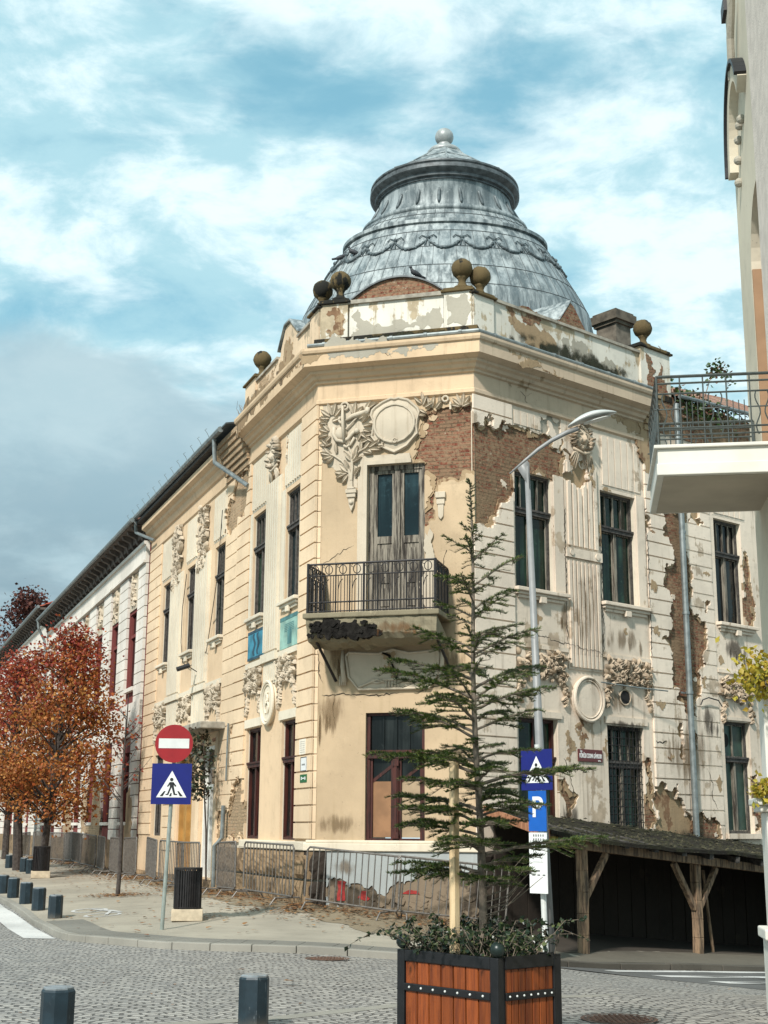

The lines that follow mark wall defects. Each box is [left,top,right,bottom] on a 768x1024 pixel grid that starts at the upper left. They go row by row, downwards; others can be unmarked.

peeling [326,307,444,337]
peeling [504,306,616,372]
flaking render [413,405,611,528]
flaking render [740,551,755,626]
flaking render [651,513,710,761]
flaking render [217,778,247,841]
flaking render [557,778,578,818]
flaking render [642,757,722,839]